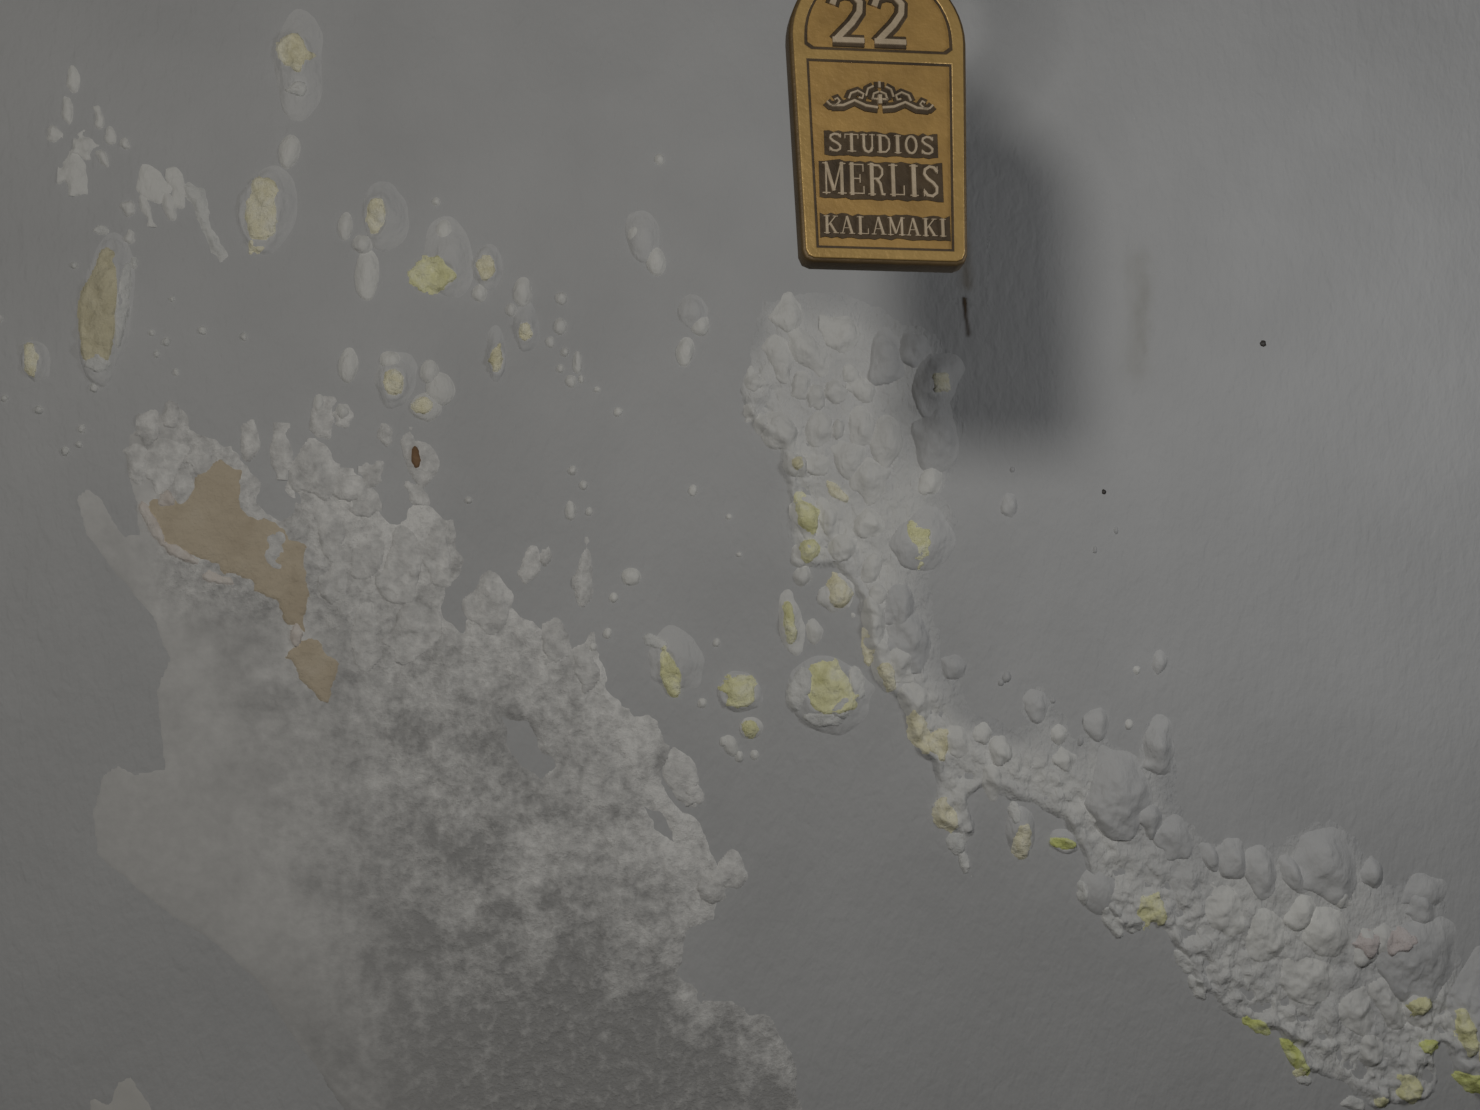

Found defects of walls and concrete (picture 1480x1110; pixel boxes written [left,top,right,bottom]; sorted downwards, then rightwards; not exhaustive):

peeling [77,396,802,1110]